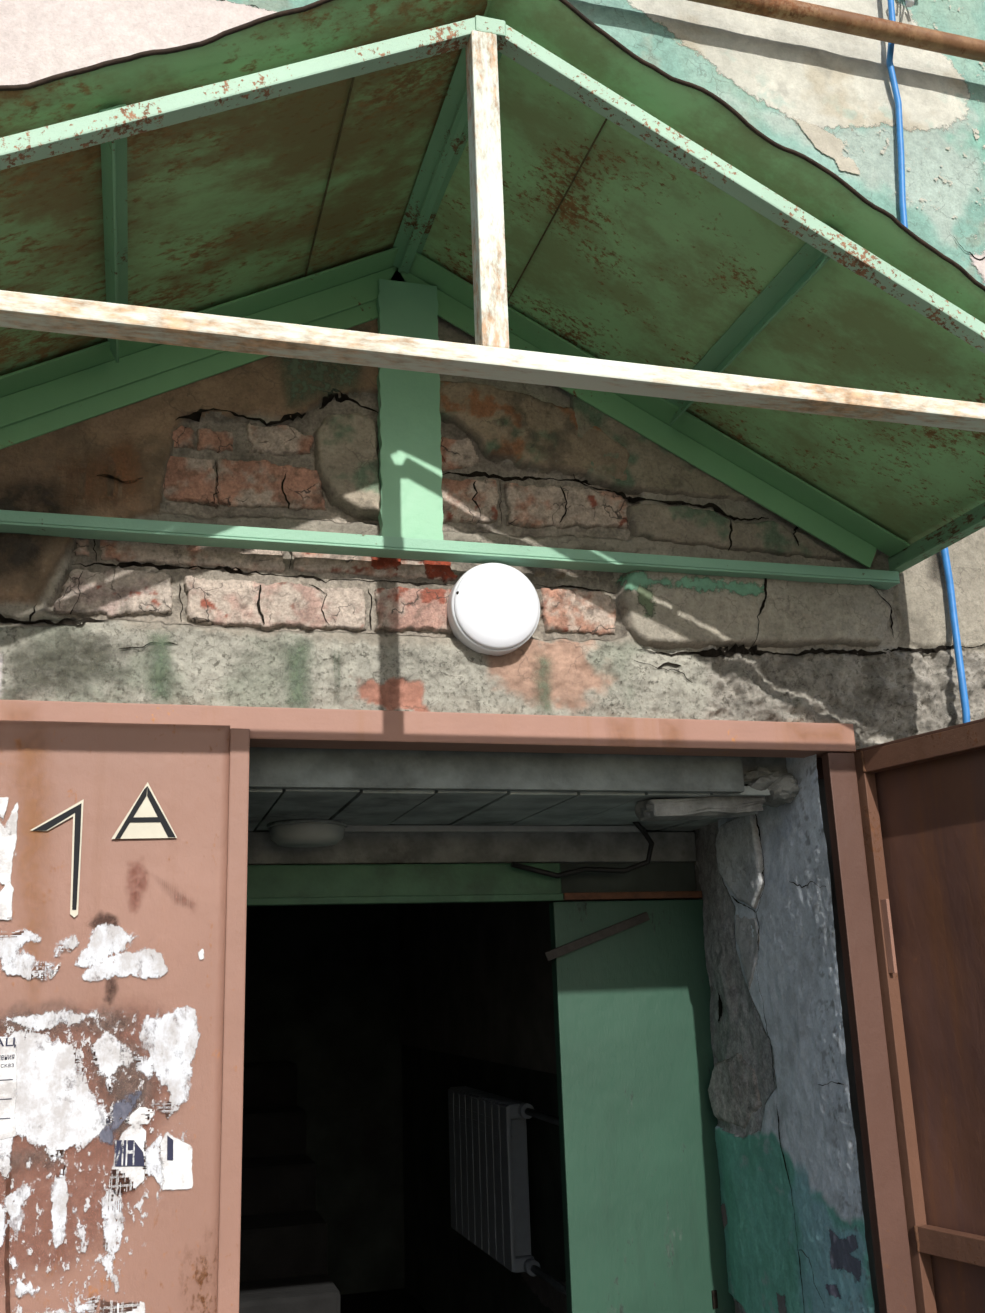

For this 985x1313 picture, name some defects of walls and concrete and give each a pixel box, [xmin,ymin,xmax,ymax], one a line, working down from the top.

peeling [0,0,276,85]
peeling [628,0,985,210]
peeling [970,224,985,283]
crack [0,604,177,649]
crack [634,660,692,683]
crack [883,643,985,654]
spalling [689,814,777,1138]
crack [732,814,826,1305]
peeling [826,1228,861,1299]